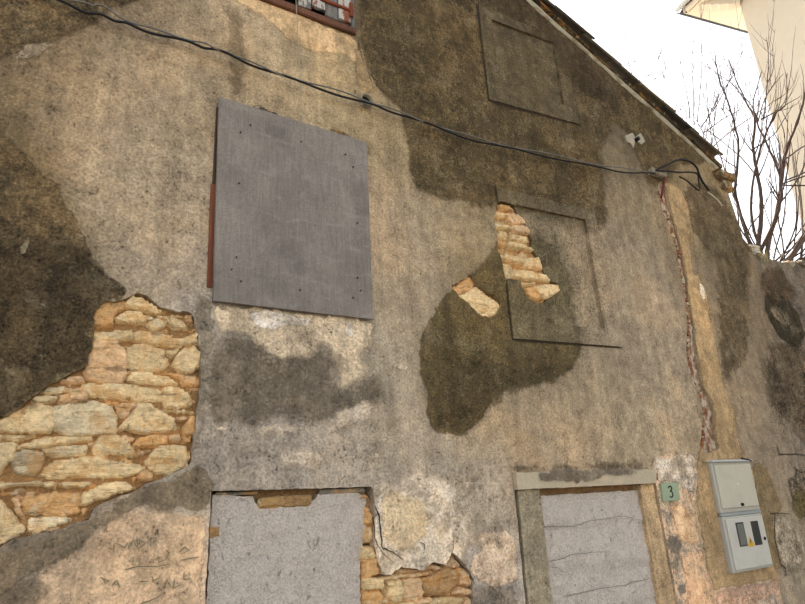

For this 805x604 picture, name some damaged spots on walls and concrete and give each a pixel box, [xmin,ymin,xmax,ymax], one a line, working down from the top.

leakage [0,0,136,58]
leakage [237,0,706,226]
leakage [0,134,125,416]
flaking render [0,295,201,547]
leakage [194,296,380,447]
flaking render [452,276,500,318]
leakage [420,241,581,436]
flaking render [494,204,560,303]
crack [658,182,716,453]
crack [373,506,402,562]
peeling [358,469,517,604]
crack [452,533,475,584]